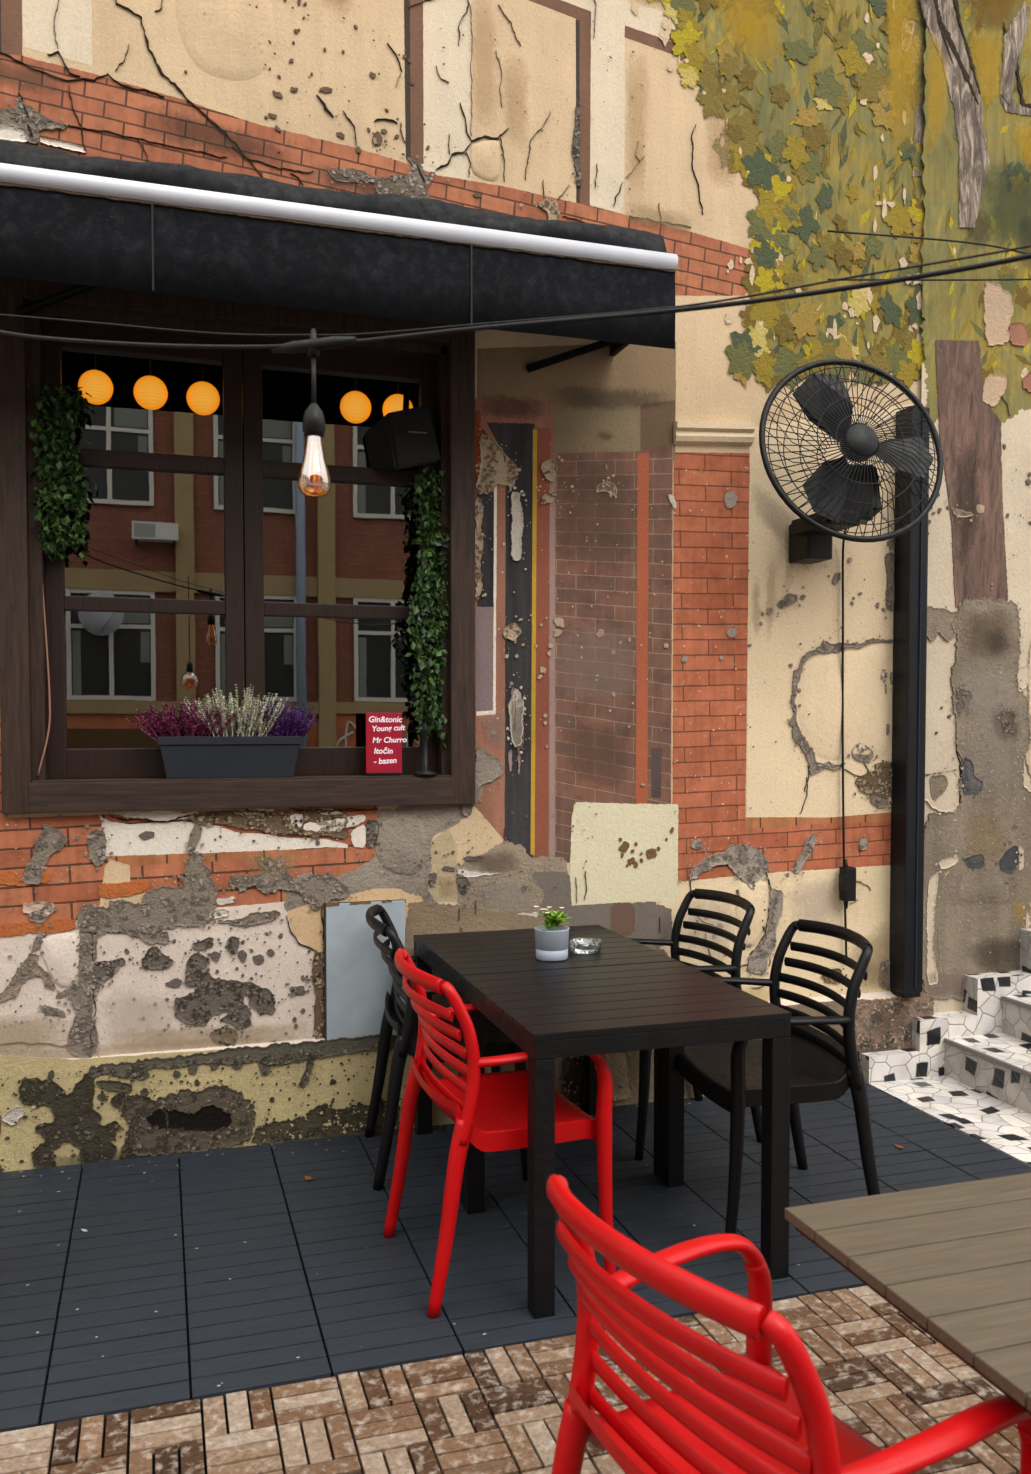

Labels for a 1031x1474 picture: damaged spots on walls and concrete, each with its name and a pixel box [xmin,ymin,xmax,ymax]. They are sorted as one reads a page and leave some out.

crack [0,0,314,185]
spalling [327,108,435,199]
crack [316,0,703,228]
peeling [983,281,1030,346]
peeling [982,372,1031,407]
peeling [475,434,524,600]
peeling [541,460,558,505]
crack [800,765,809,813]
spalling [855,596,1031,1060]
spalling [689,833,816,975]
spalling [0,808,400,1169]